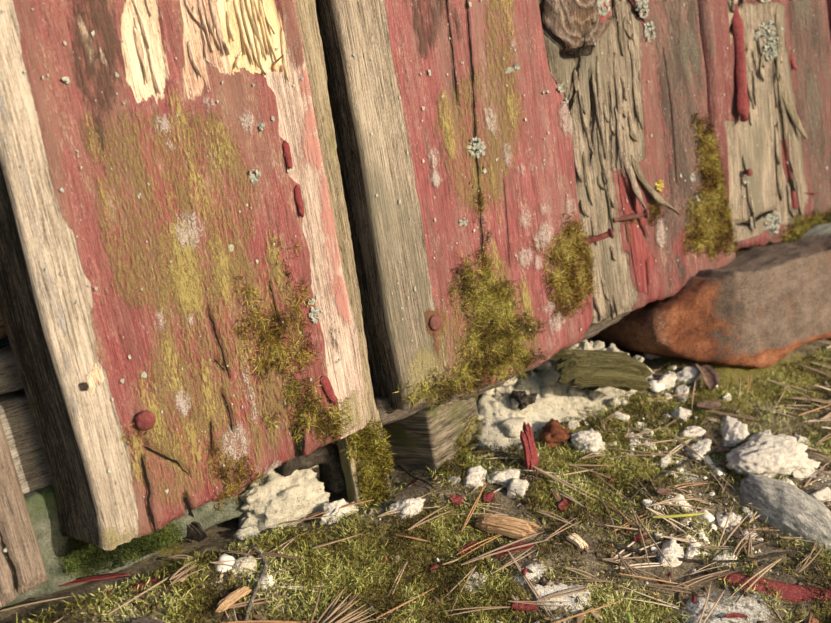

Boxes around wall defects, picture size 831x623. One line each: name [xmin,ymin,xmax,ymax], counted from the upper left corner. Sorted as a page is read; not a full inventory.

peeling [265,0,367,439]
crack [446,0,485,265]
crack [502,180,510,268]
peeling [538,0,681,323]
peeling [726,0,820,242]
crack [207,309,233,457]
crack [0,532,19,593]
crack [141,446,189,532]
crack [183,498,194,518]